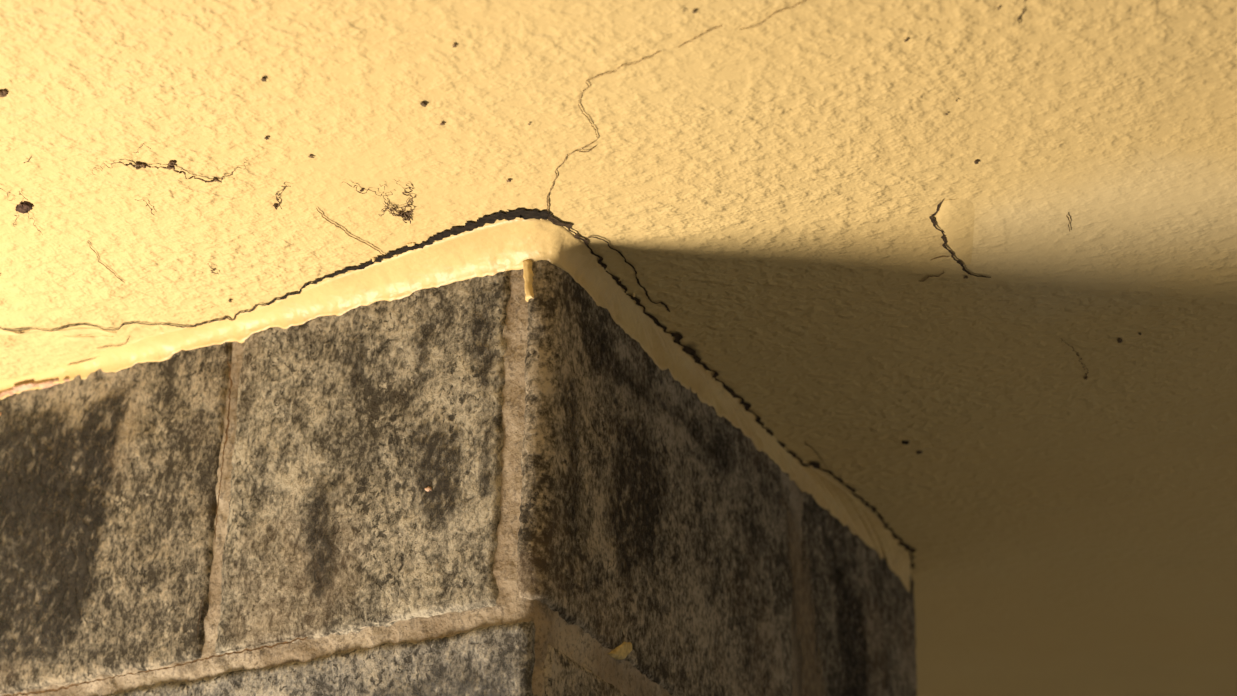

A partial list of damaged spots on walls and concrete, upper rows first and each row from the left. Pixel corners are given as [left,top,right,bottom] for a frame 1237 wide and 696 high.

crack [0,0,916,568]
crack [918,200,991,282]
damp [0,386,129,666]